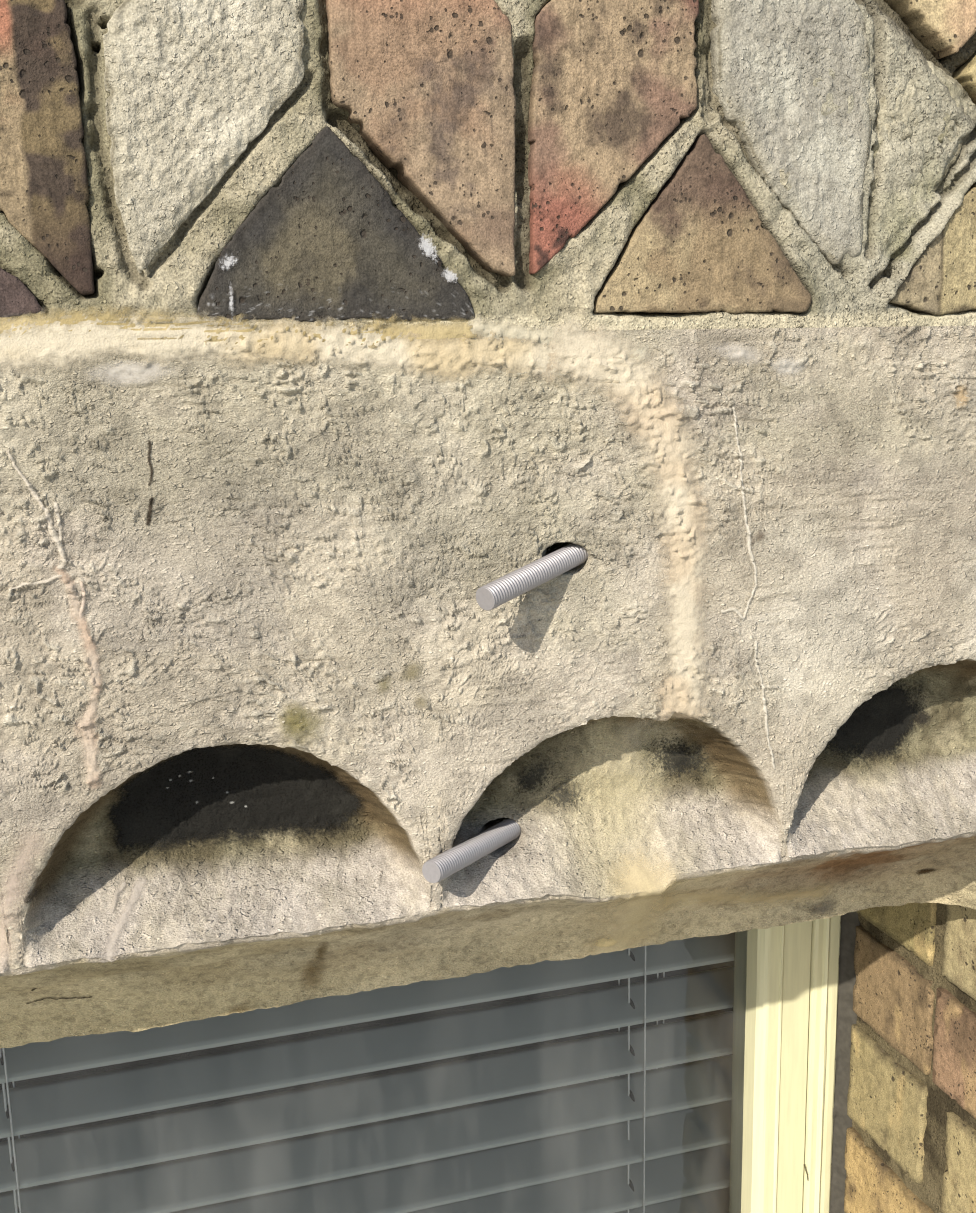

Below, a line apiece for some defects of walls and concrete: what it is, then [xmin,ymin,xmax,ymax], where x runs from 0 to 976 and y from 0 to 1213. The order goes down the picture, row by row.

crack [0,309,775,787]
crack [595,869,823,953]